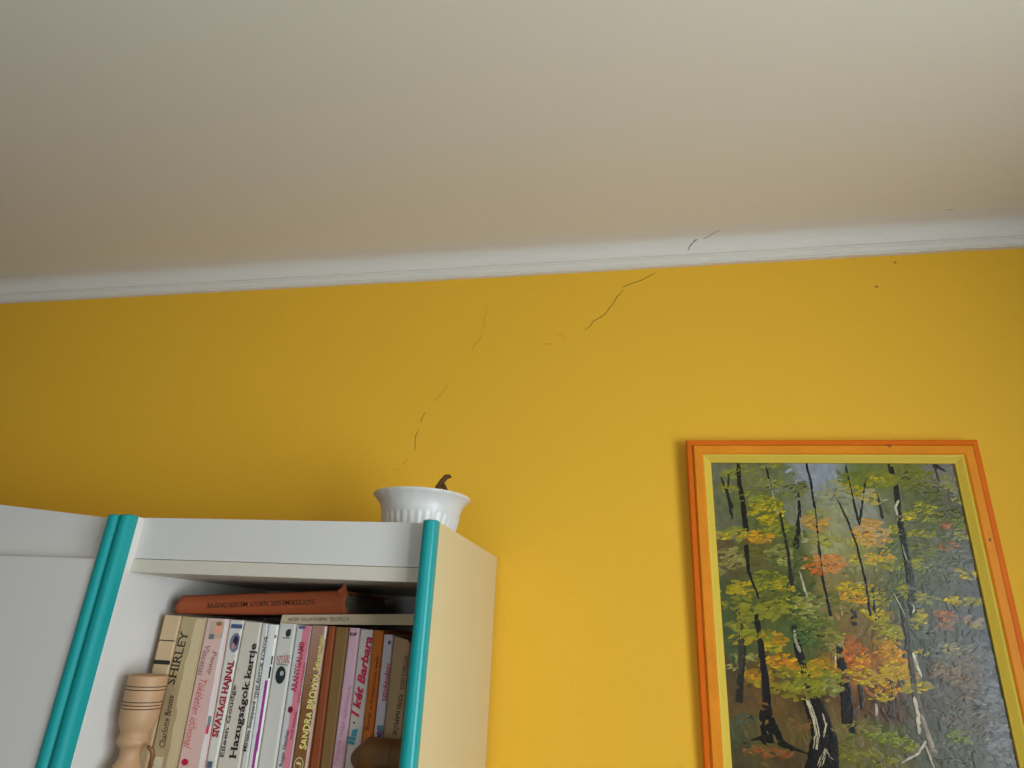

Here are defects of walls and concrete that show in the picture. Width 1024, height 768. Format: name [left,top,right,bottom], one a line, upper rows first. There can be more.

crack [544,273,655,344]